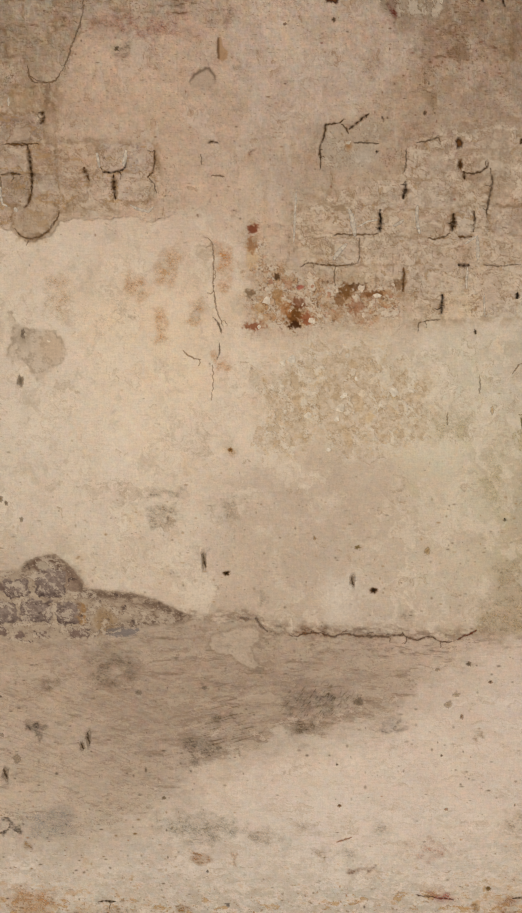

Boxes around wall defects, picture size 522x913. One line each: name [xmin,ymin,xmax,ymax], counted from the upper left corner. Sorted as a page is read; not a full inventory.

spalling [217,38,228,62]
peeling [378,0,449,23]
spalling [0,98,163,243]
crack [184,238,227,400]
spalling [237,113,522,468]
spalling [0,555,190,644]
crack [297,630,477,644]